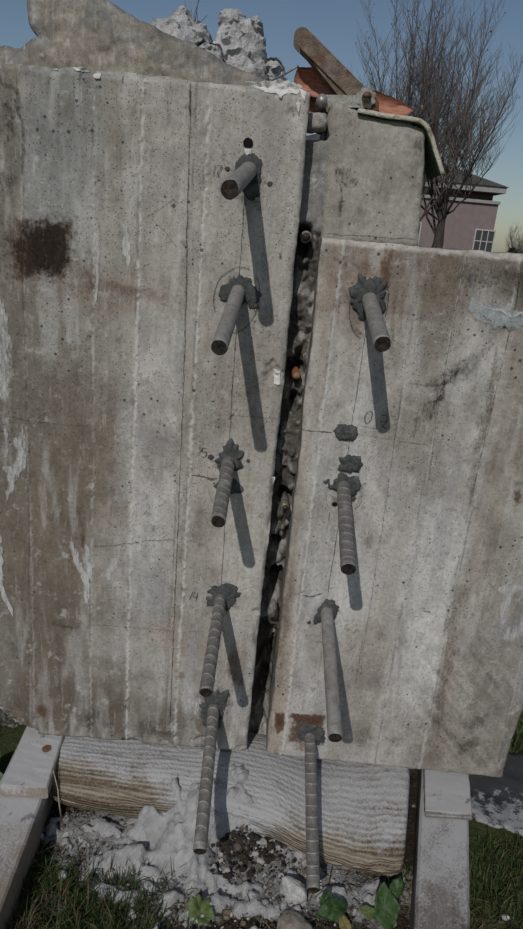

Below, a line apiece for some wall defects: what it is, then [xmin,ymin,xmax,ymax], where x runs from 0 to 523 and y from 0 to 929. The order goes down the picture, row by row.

peeling [469,298,523,331]
damp [0,301,12,399]
damp [3,429,27,495]
damp [0,536,13,616]
damp [70,535,92,603]
corrosion [274,712,325,743]